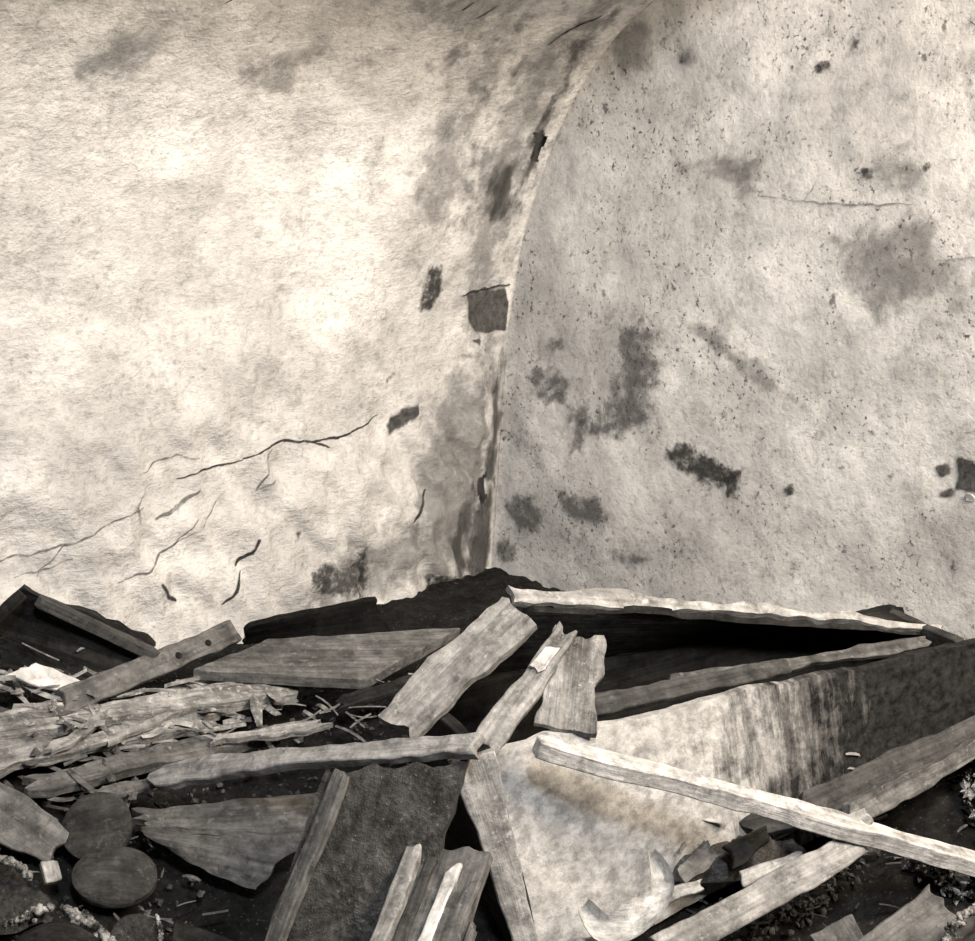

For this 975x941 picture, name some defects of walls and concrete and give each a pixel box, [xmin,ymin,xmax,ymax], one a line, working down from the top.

leakage [488,40,587,220]
leakage [421,266,443,312]
flaking render [463,284,510,344]
crack [145,414,378,490]
flaking render [388,405,419,433]
leakage [426,363,515,588]
leakage [570,319,658,453]
flaking render [935,457,975,502]
crack [0,497,144,578]
crack [119,501,216,601]
crack [222,539,261,604]
leakage [312,547,368,597]